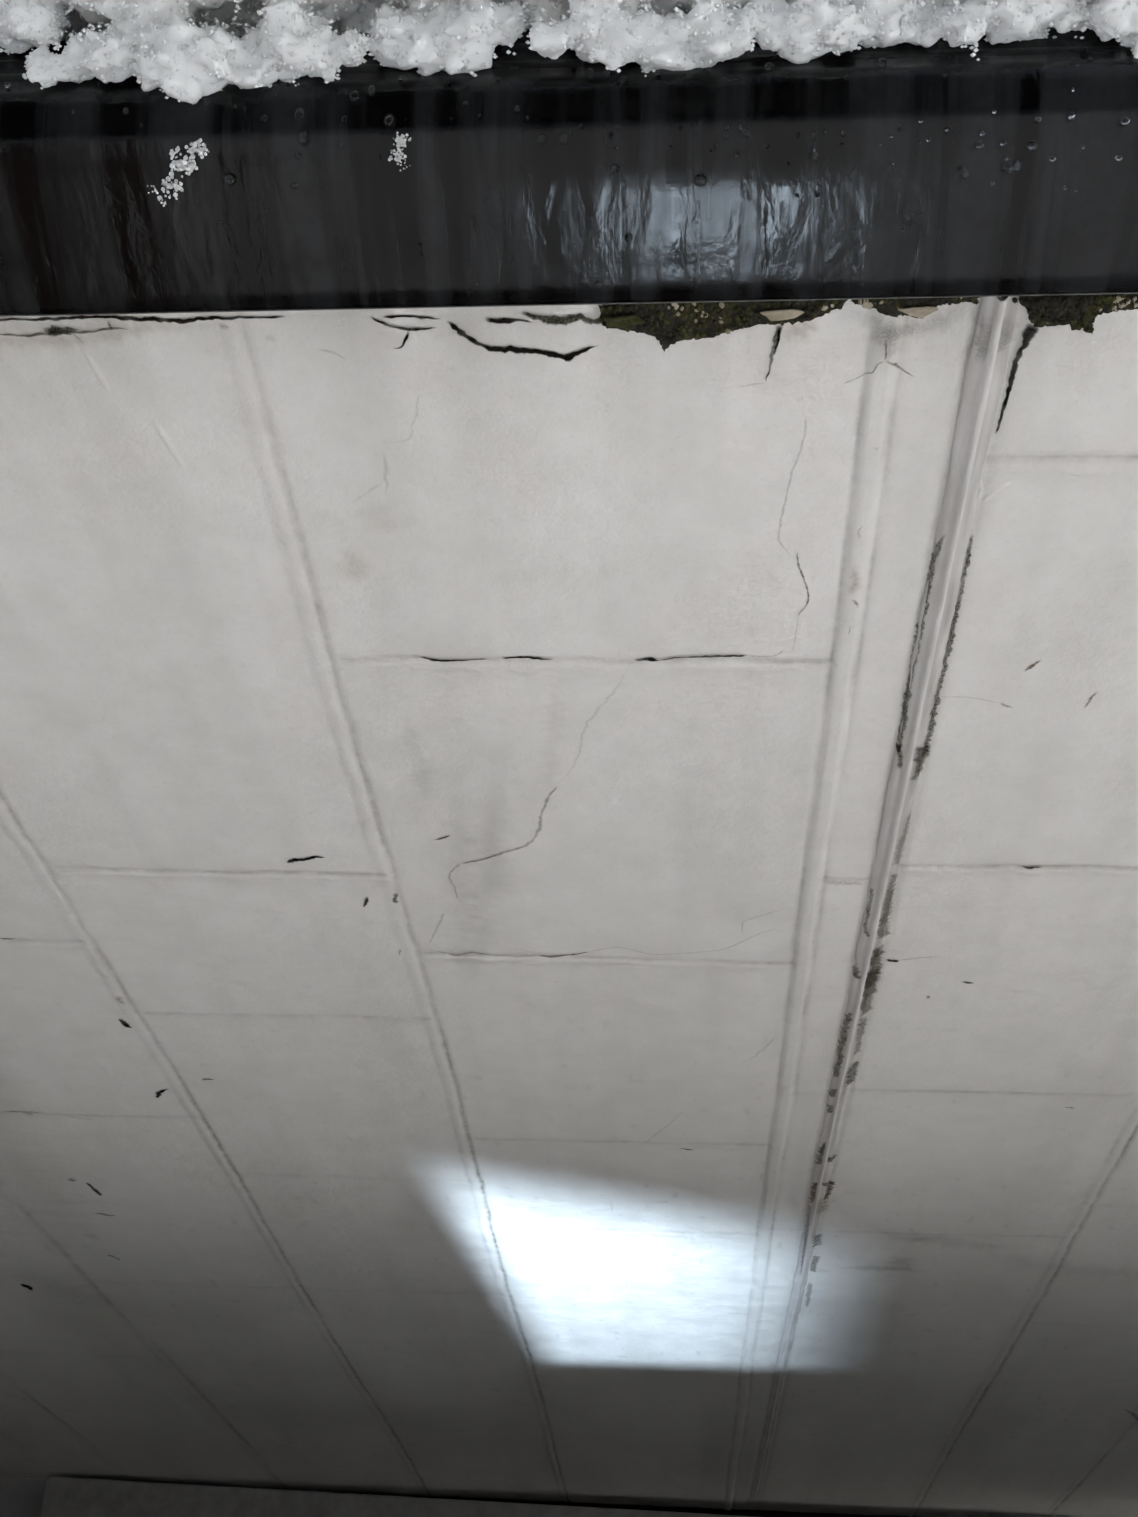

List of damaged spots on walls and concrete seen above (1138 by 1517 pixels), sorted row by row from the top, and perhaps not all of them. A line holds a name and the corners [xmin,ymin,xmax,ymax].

crack [372,312,606,361]
spalling [598,297,979,352]
spalling [1002,294,1138,334]
crack [797,554,809,613]
crack [422,655,551,663]
crack [637,654,745,662]
leakage [896,538,972,780]
leakage [827,876,896,1113]